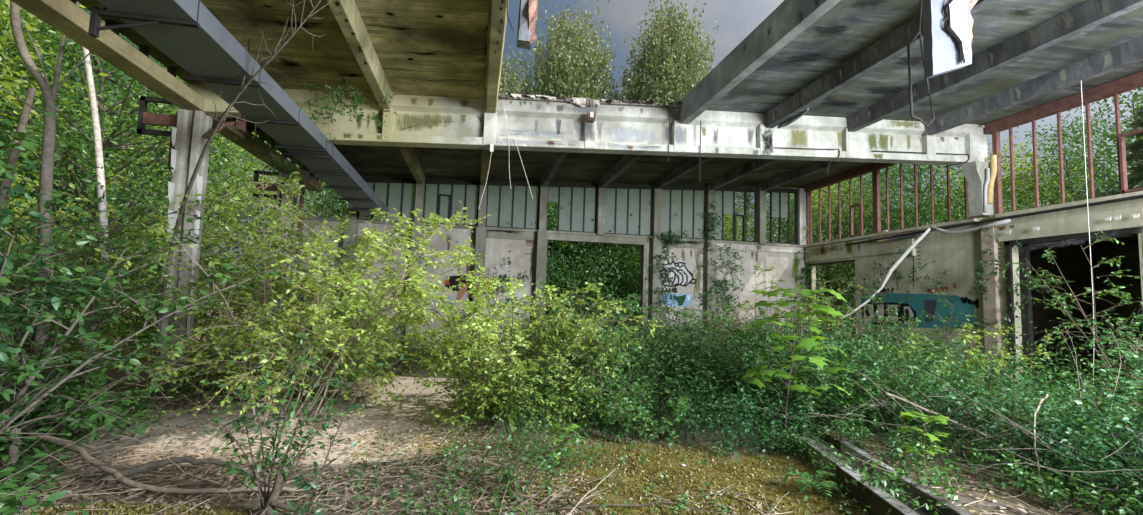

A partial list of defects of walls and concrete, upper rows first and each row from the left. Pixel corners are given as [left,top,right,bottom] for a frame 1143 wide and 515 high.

leakage [264,4,323,28]
leakage [815,26,850,34]
leakage [786,53,825,62]
leakage [748,90,810,155]
leakage [869,134,922,151]